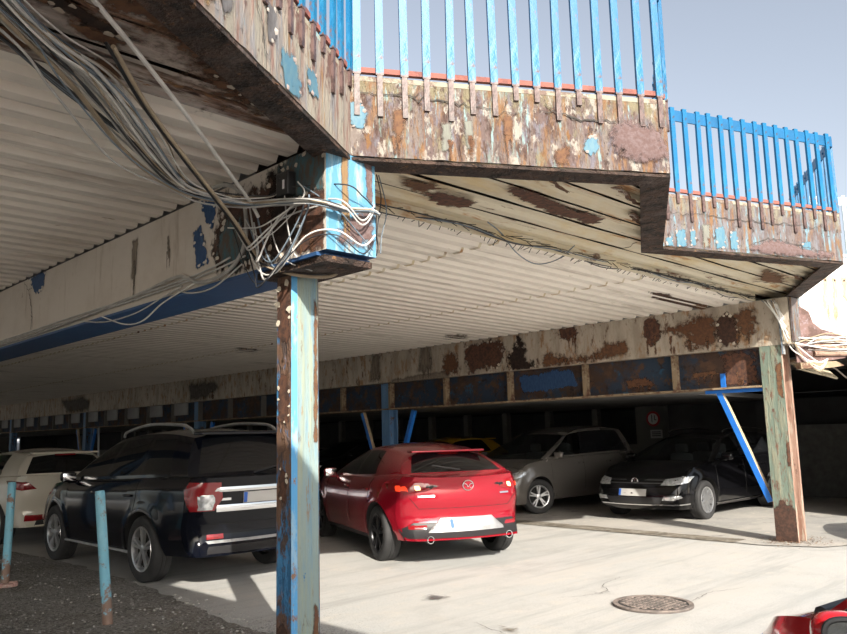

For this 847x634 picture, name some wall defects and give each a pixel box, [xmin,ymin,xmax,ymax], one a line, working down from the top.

peeling [267,2,319,98]
rust [391,109,406,156]
peeling [193,151,324,275]
rust [402,179,478,208]
rust [507,187,605,224]
peeling [666,229,697,247]
peeling [715,226,739,250]
peeling [29,271,46,294]
rust [542,327,628,367]
rust [643,303,762,389]
peeling [277,374,290,423]
rust [774,500,798,543]